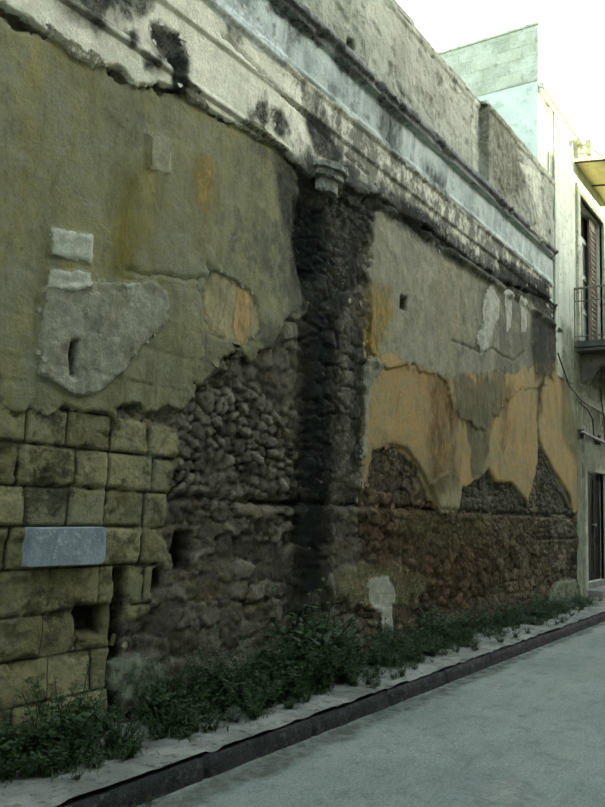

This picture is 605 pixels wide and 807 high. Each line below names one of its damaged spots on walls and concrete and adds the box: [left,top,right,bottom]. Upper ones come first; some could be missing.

water stain [66,0,154,26]
water stain [126,29,139,48]
water stain [143,52,162,70]
spalling [148,18,191,97]
water stain [249,101,289,136]
water stain [381,115,402,157]
water stain [479,106,525,194]
peeling [201,270,261,346]
peeling [476,285,529,356]
water stain [277,103,392,654]
peeling [355,341,579,521]
water stain [531,301,605,584]